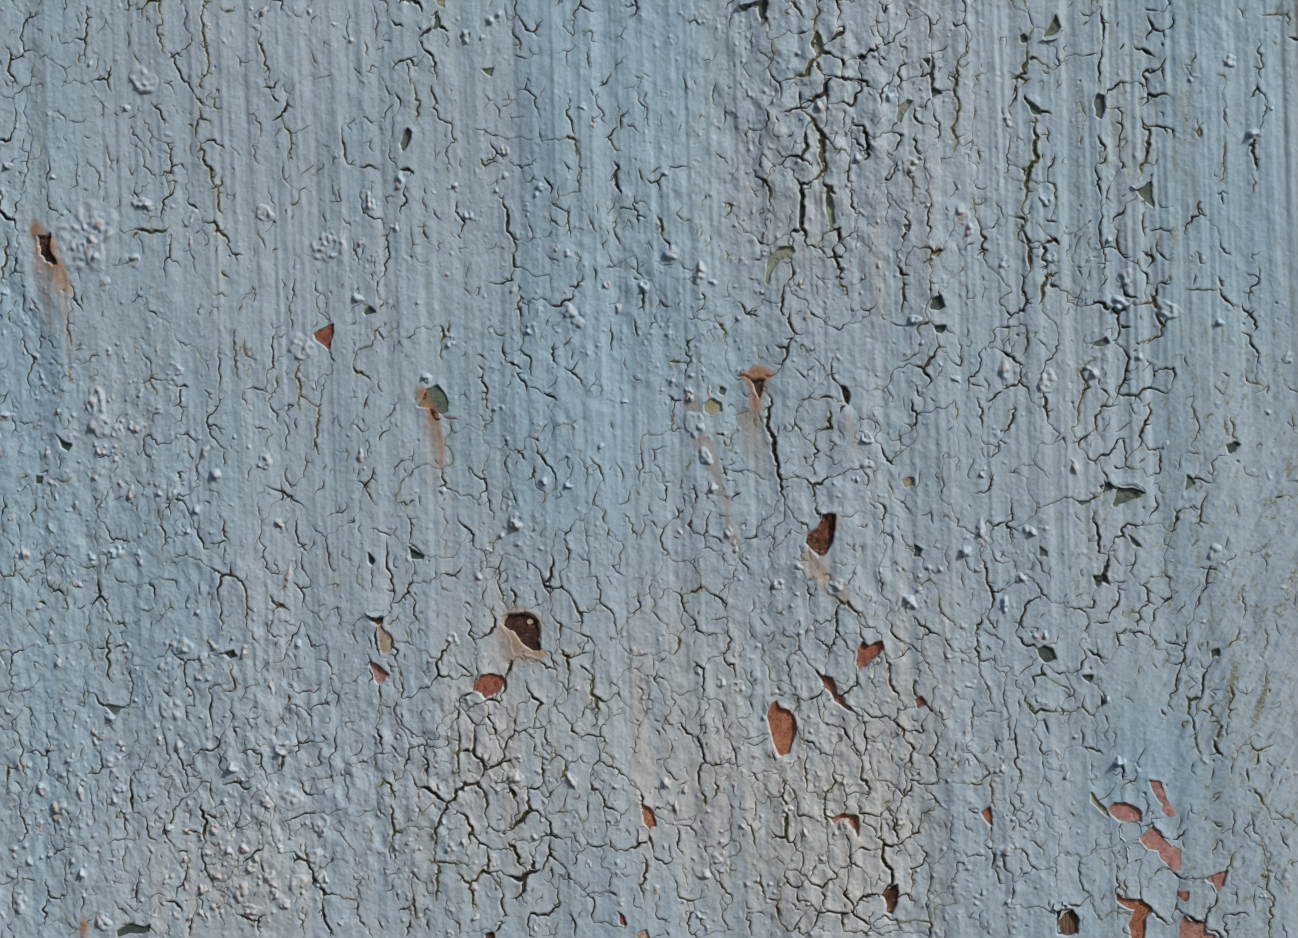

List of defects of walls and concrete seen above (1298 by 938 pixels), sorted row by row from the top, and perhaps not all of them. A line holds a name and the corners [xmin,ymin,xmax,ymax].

crack [1238,7,1298,194]
crack [1138,110,1175,181]
crack [590,57,687,327]
corrosion [31,223,67,284]
crack [130,286,252,467]
crack [333,322,454,459]
corrosion [743,366,772,414]
peeling [806,514,835,557]
peeling [501,613,547,658]
peeling [767,701,796,756]
peeling [1091,793,1181,873]
peeling [1117,894,1152,938]